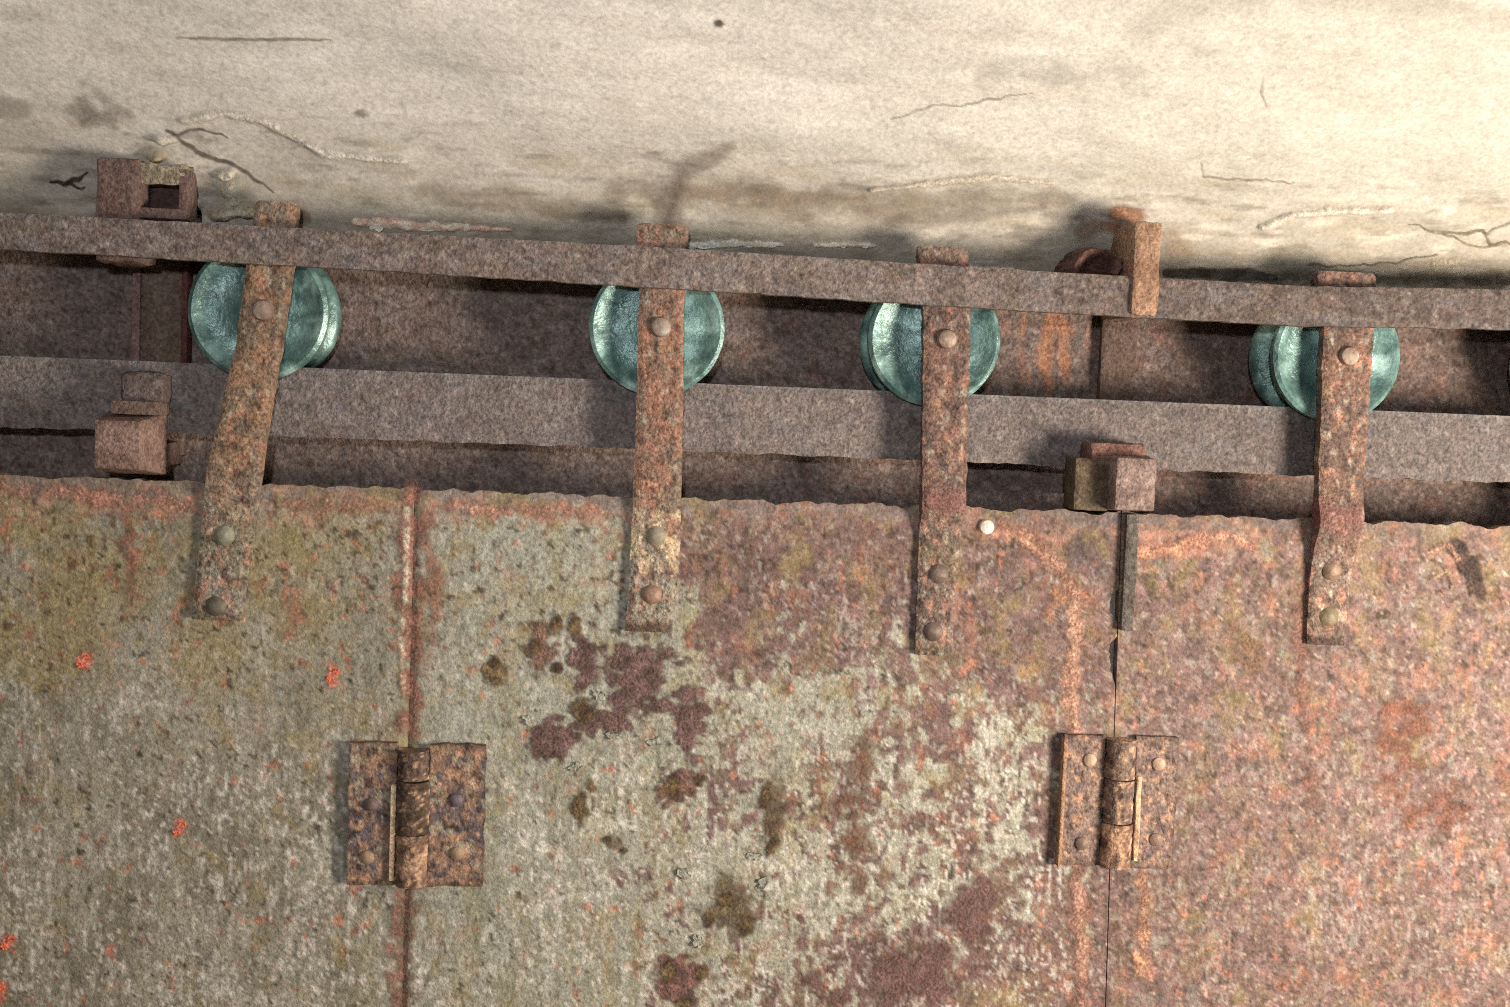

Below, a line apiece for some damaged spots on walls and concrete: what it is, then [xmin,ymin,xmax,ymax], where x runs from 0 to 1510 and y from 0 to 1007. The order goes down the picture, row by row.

crack [166,128,274,193]
crack [1309,223,1510,269]
corrosion [0,481,197,596]
corrosion [1137,531,1256,559]
corrosion [76,651,93,668]
corrosion [326,664,340,688]
corrosion [394,486,630,740]
corrosion [981,518,1085,734]
corrosion [838,730,877,894]
corrosion [1068,865,1098,1007]
corrosion [1134,869,1152,979]